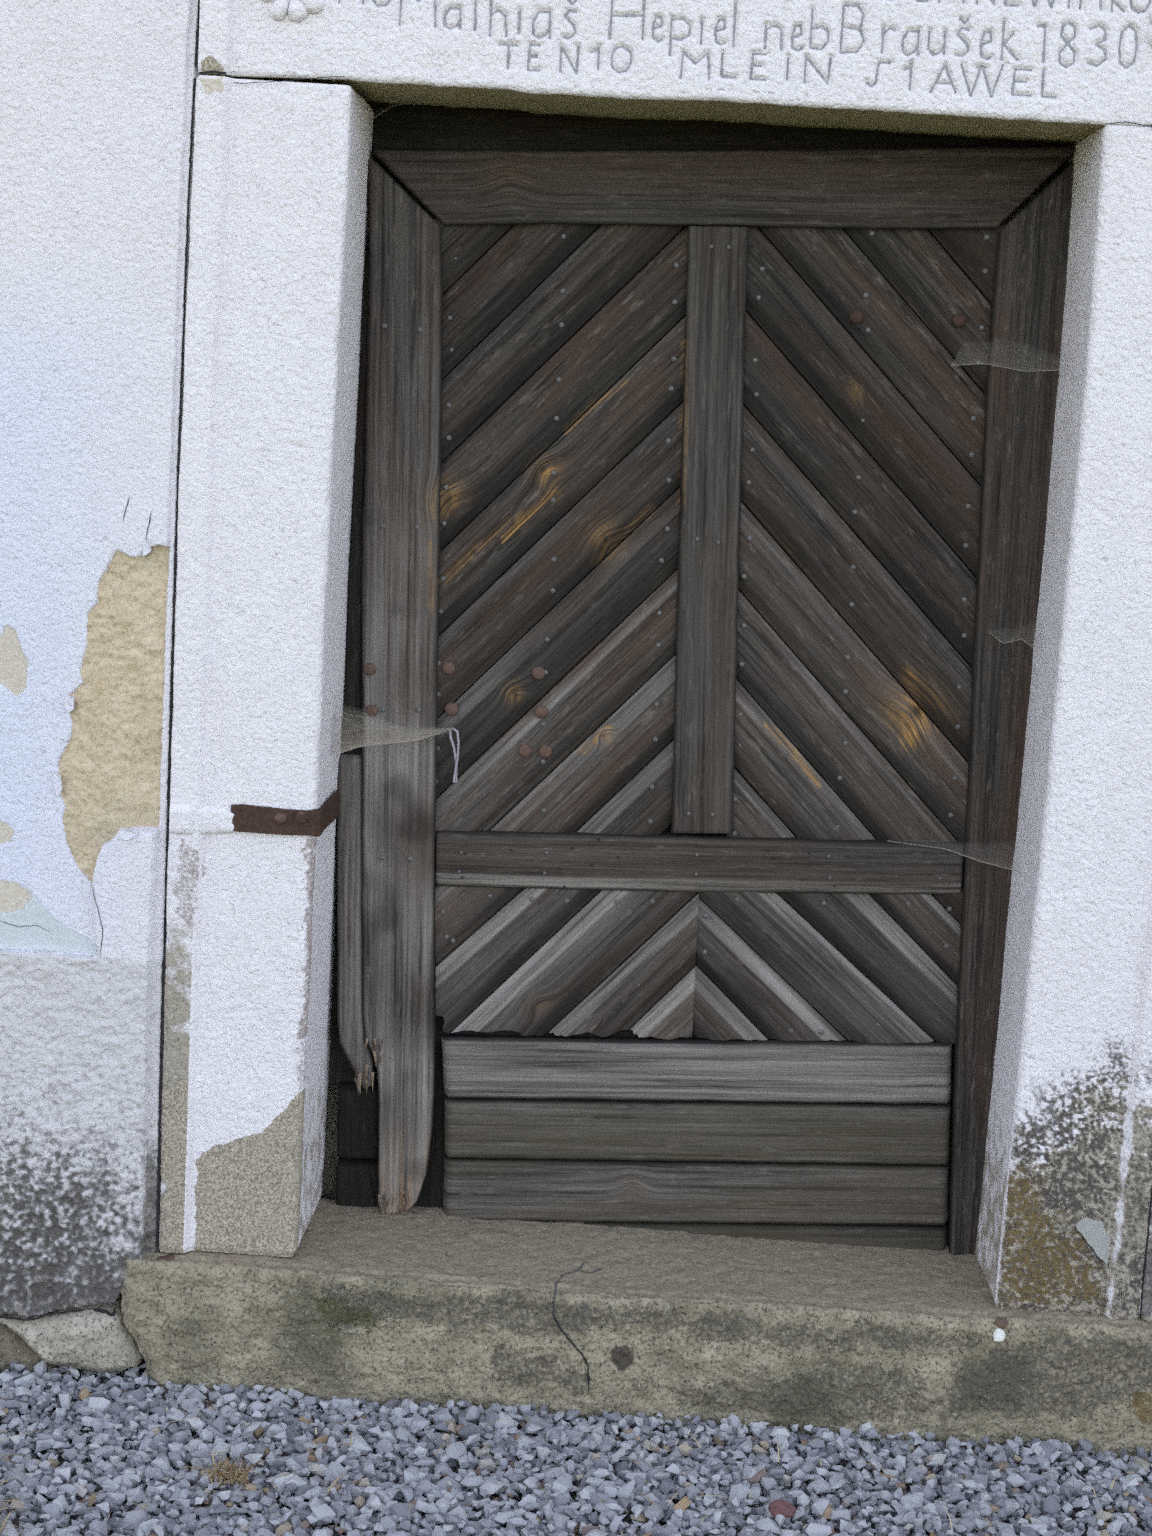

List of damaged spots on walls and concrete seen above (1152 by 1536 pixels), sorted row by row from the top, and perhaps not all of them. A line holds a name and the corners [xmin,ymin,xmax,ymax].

peeling [0,625,28,696]
flaking render [52,539,170,882]
peeling [0,821,14,843]
peeling [0,880,31,912]
water stain [0,1127,118,1311]
water stain [322,1040,1152,1425]